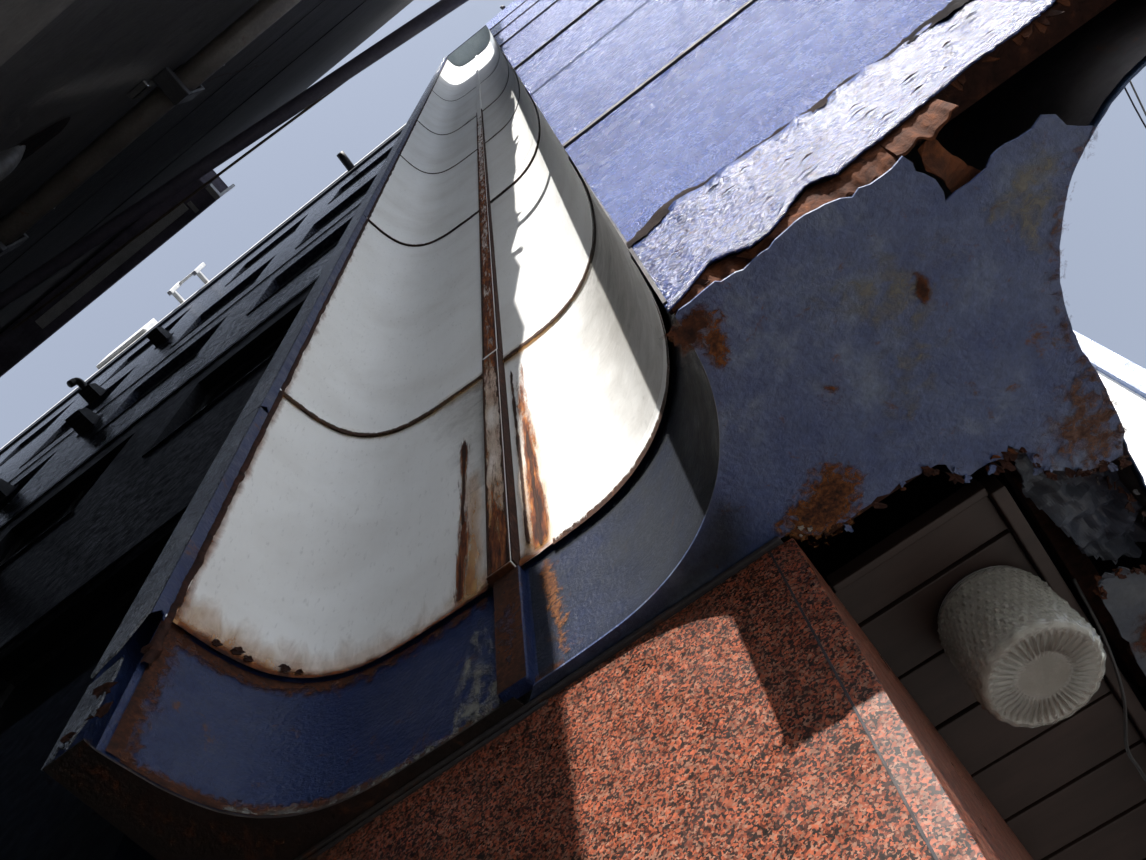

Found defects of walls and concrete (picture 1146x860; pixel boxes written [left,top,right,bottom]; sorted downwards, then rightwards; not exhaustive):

corrosion [1012,0,1070,46]
corrosion [1049,186,1069,255]
corrosion [985,293,1132,481]
corrosion [106,59,972,816]
corrosion [1093,565,1146,599]
peeling [454,659,497,734]